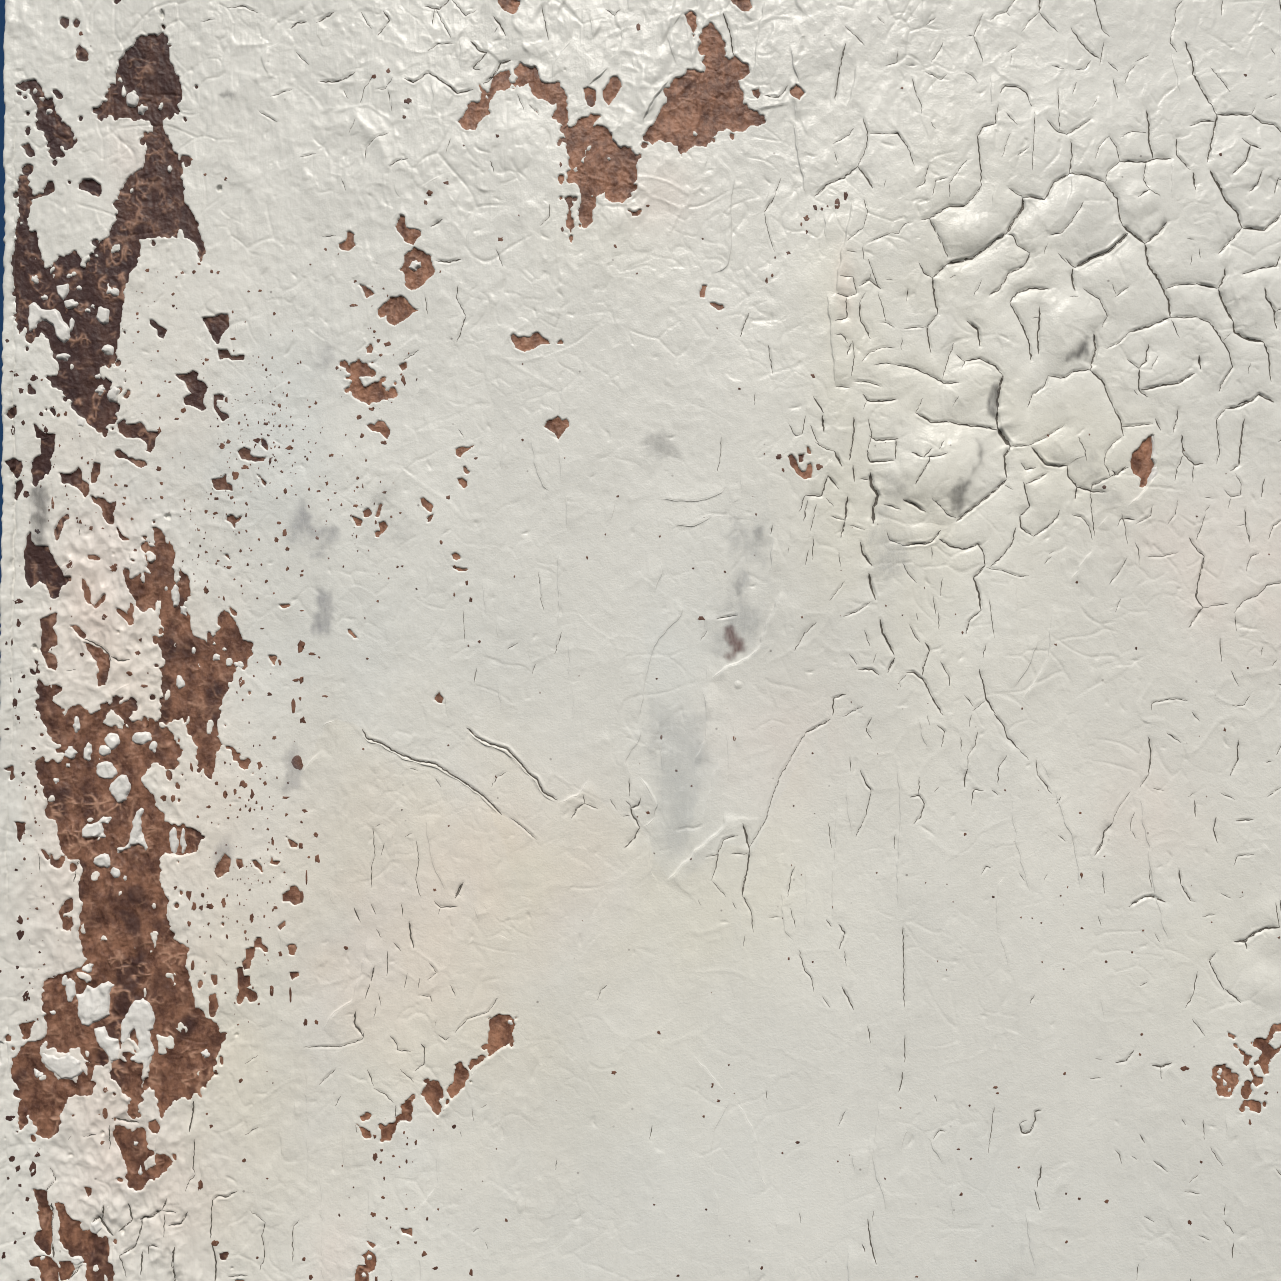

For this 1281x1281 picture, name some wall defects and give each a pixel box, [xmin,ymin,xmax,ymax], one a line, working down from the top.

peeling [11,25,206,468]
peeling [360,215,435,326]
peeling [176,370,229,421]
peeling [340,344,407,405]
crack [700,0,1281,1042]
peeling [5,424,297,1191]
crack [362,728,641,847]
crack [309,824,496,1116]
peeling [357,1014,515,1142]
peeling [1211,1023,1281,1113]
peeling [18,1189,117,1281]
crack [1116,1120,1234,1258]